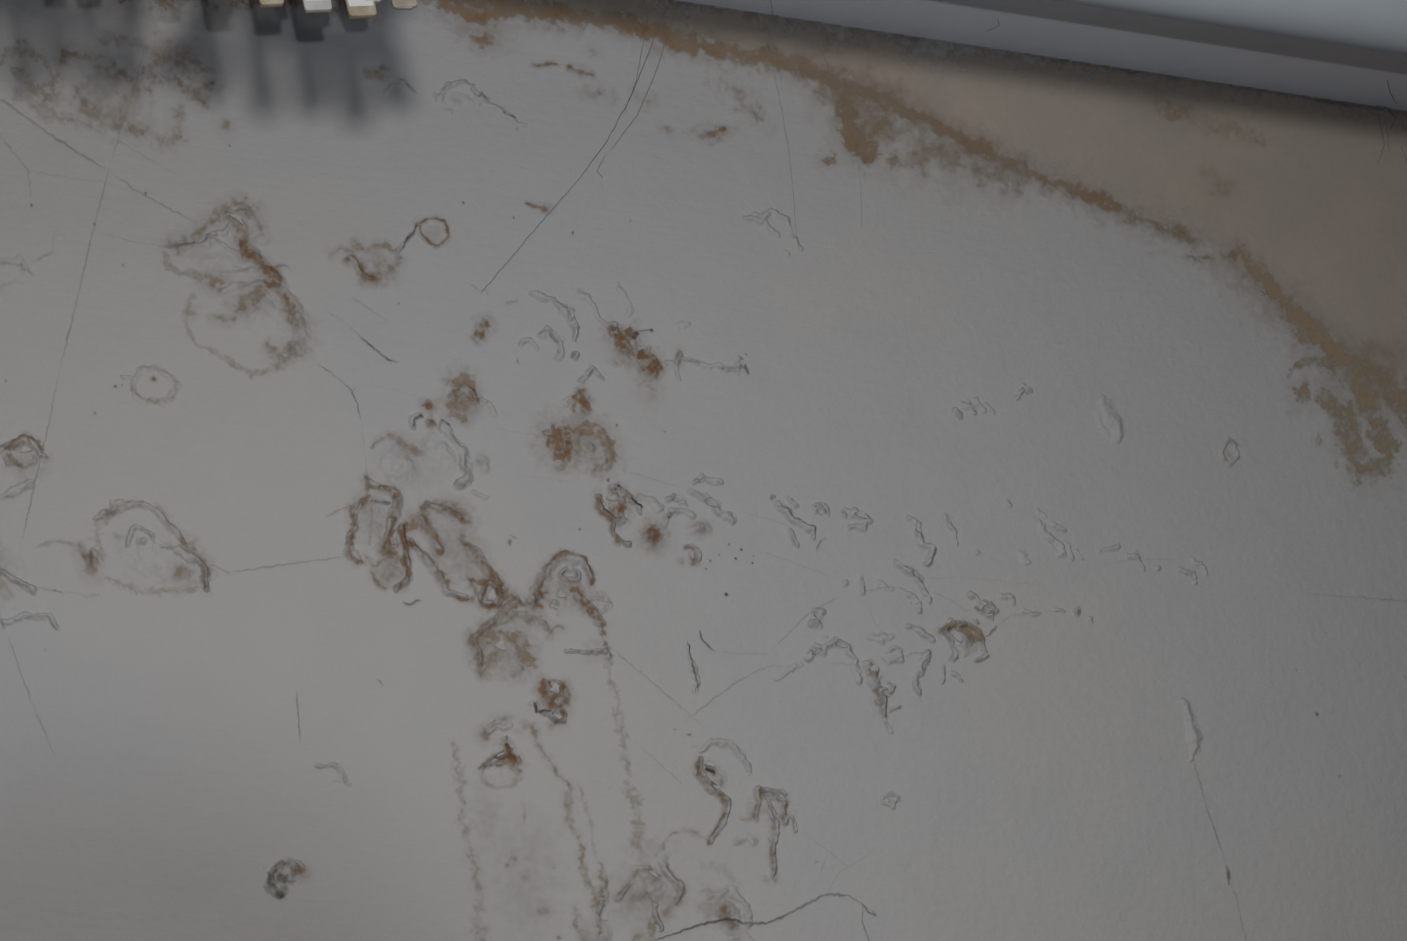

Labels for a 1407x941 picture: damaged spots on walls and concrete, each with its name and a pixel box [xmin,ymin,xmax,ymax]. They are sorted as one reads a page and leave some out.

leakage [423,0,1407,484]
peeling [517,282,635,386]
peeling [0,434,48,502]
peeling [0,568,61,632]
peeling [772,513,1094,734]
crack [1177,697,1204,763]
peeling [692,737,798,881]
crack [658,917,783,939]